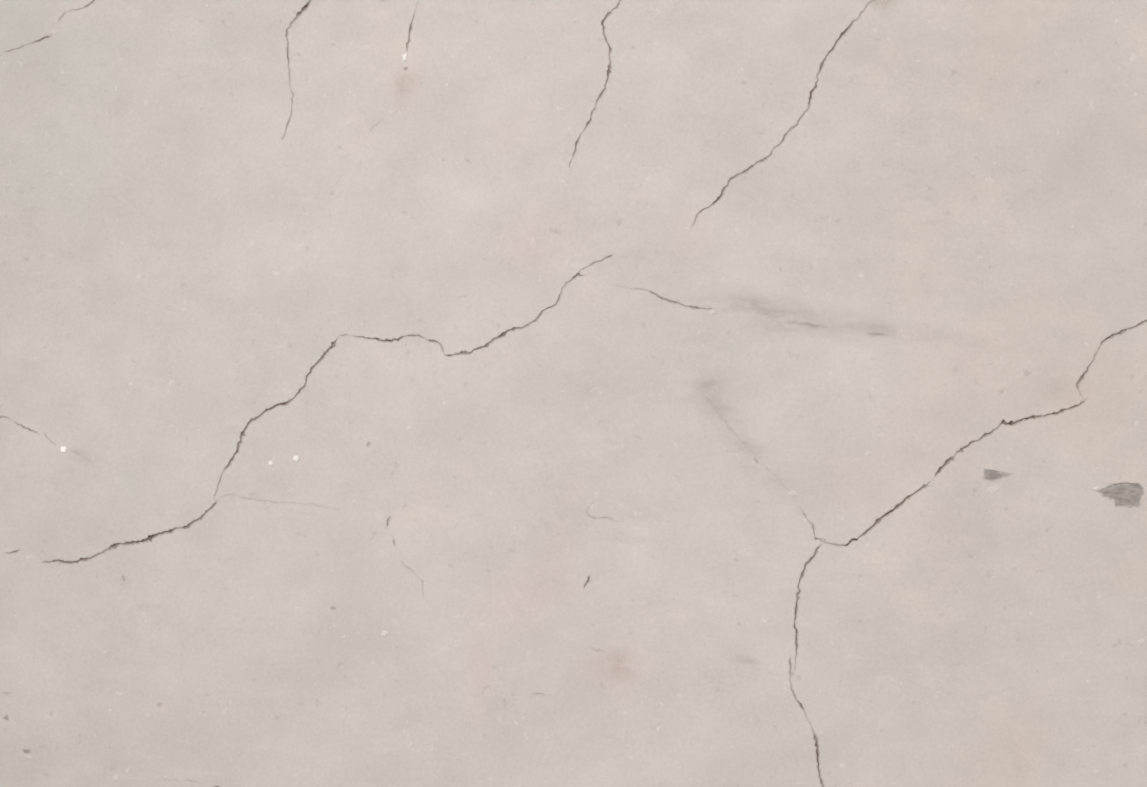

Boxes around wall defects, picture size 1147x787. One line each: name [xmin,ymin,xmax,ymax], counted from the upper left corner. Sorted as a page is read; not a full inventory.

crack [286,0,311,61]
crack [574,4,618,153]
crack [696,21,853,217]
crack [226,255,612,468]
crack [51,503,216,563]
crack [789,320,1147,666]
spalling [1100,483,1142,506]
crack [814,735,824,787]